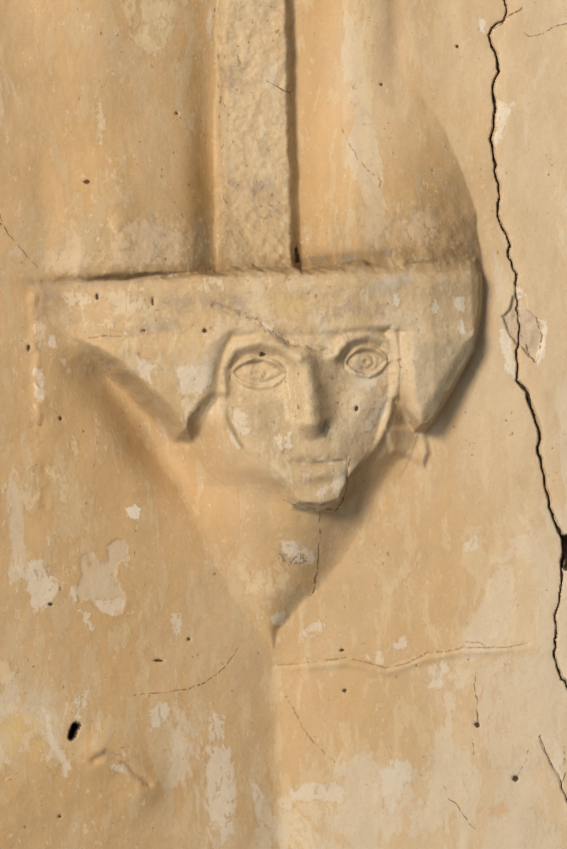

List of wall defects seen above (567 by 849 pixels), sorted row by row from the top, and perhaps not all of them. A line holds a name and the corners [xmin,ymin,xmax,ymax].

peeling [134,356,157,386]
peeling [175,358,216,439]
spalling [499,284,549,388]
crack [488,0,567,687]
crack [310,458,351,596]
peeling [3,530,132,632]
peeling [147,700,277,849]
peeling [287,779,351,834]
crack [522,738,567,801]